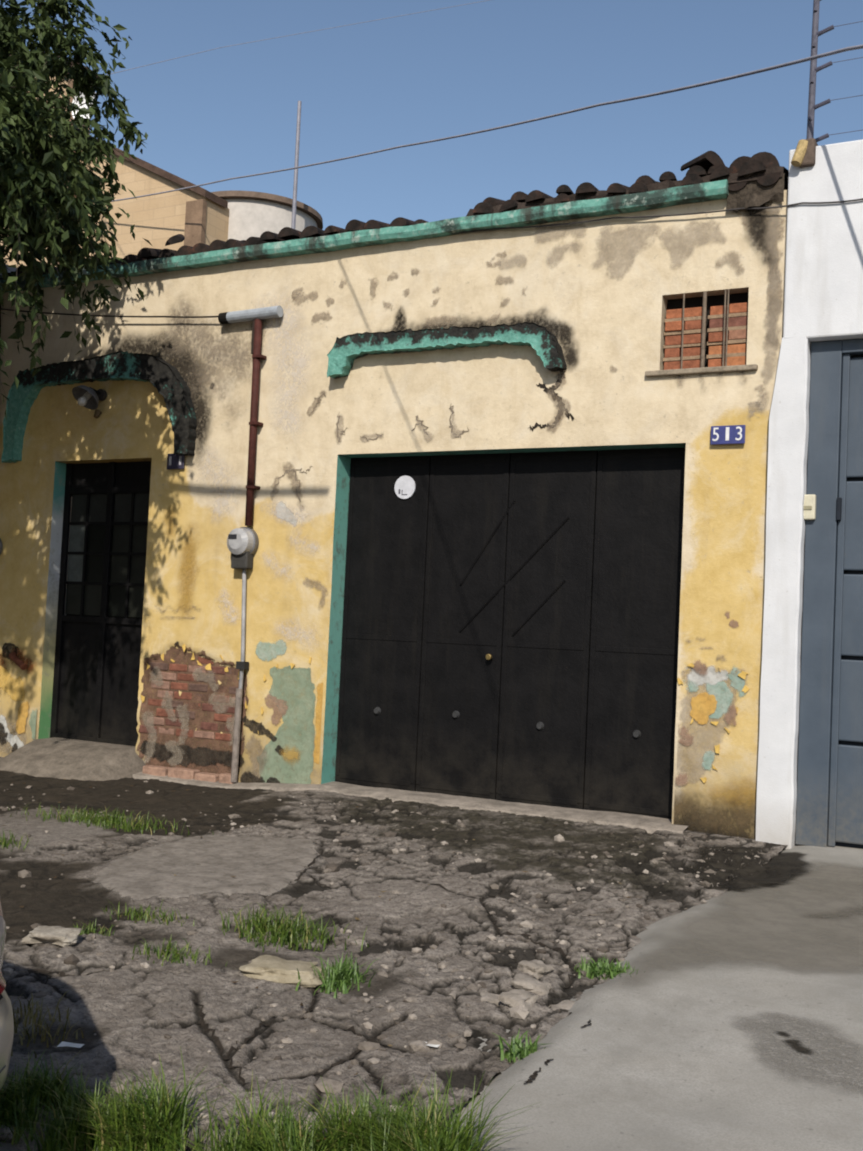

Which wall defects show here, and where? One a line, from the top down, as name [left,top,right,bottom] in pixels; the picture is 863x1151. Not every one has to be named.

damp [88,318,250,450]
crack [530,369,574,432]
spalling [0,643,37,752]
spalling [137,629,323,784]
peeling [677,656,750,746]
crack [290,846,335,889]
crack [6,960,129,1002]
crack [416,880,592,991]
crack [181,988,411,1112]
crack [523,1059,554,1084]